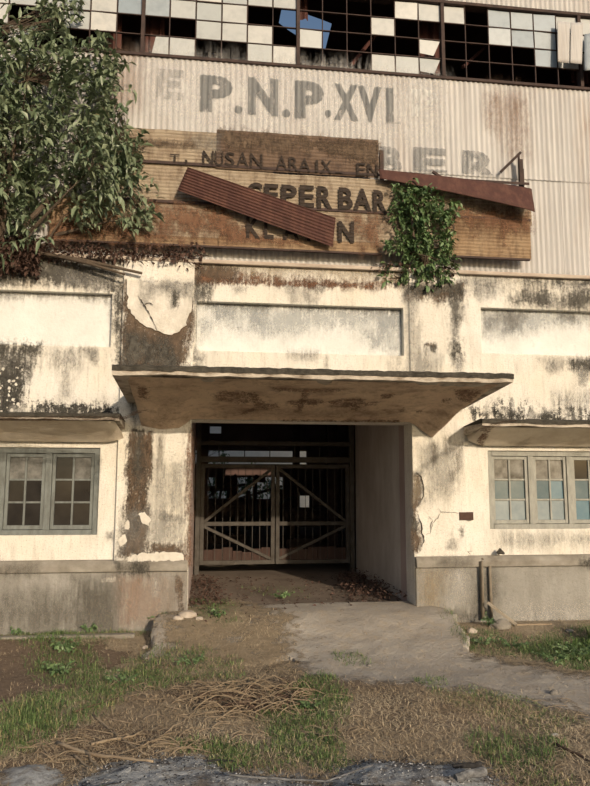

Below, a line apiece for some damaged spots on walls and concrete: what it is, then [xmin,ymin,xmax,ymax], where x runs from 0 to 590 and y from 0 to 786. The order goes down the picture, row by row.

damp [0,258,124,364]
spalling [121,264,403,366]
damp [247,276,497,362]
damp [487,279,590,333]
damp [0,342,137,422]
damp [471,398,531,421]
damp [538,394,590,420]
damp [569,359,590,382]
spalling [117,429,184,562]
spalling [411,474,422,553]
crack [416,472,455,547]